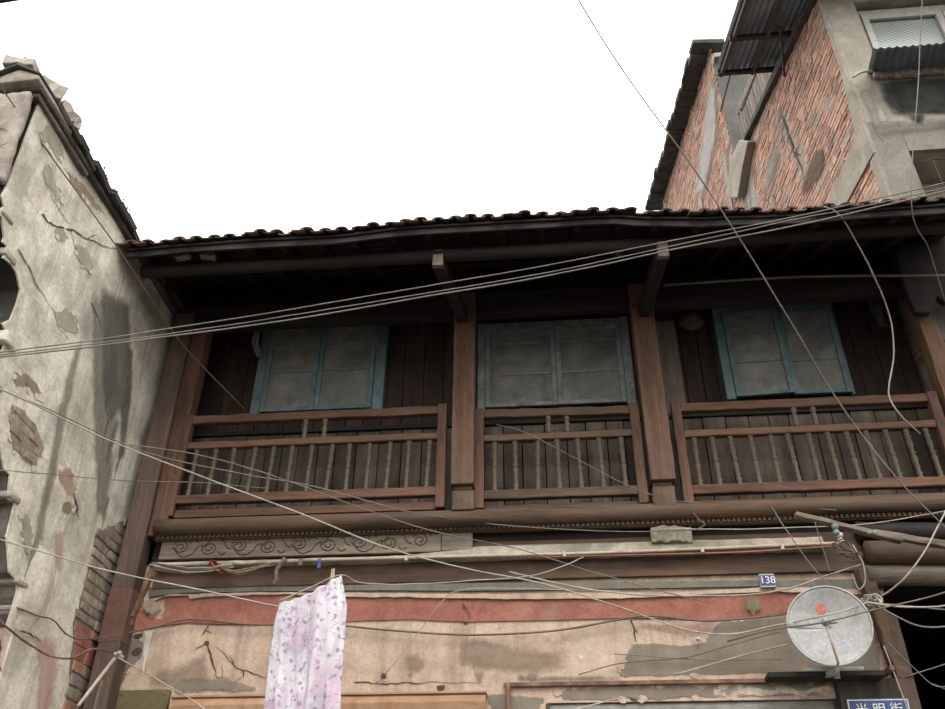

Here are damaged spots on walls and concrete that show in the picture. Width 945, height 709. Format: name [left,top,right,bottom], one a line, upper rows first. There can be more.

leakage [862,78,945,139]
peeling [40,126,105,213]
crack [42,195,120,250]
peeling [51,304,80,338]
peeling [12,370,45,402]
spalling [8,405,44,472]
crack [195,626,267,691]